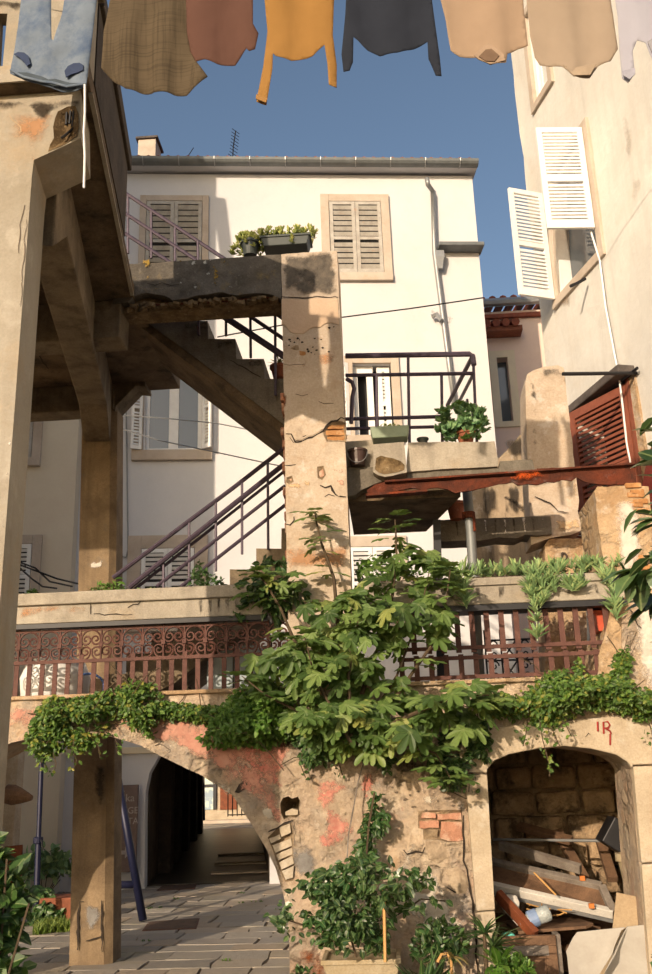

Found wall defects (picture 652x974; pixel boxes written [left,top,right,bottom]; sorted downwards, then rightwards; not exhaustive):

damp [31,101,78,117]
flaking render [282,298,339,356]
crack [284,394,345,466]
damp [507,438,521,454]
damp [484,487,534,530]
peeling [318,781,351,846]
spalling [395,784,463,842]
flaking render [410,873,464,964]